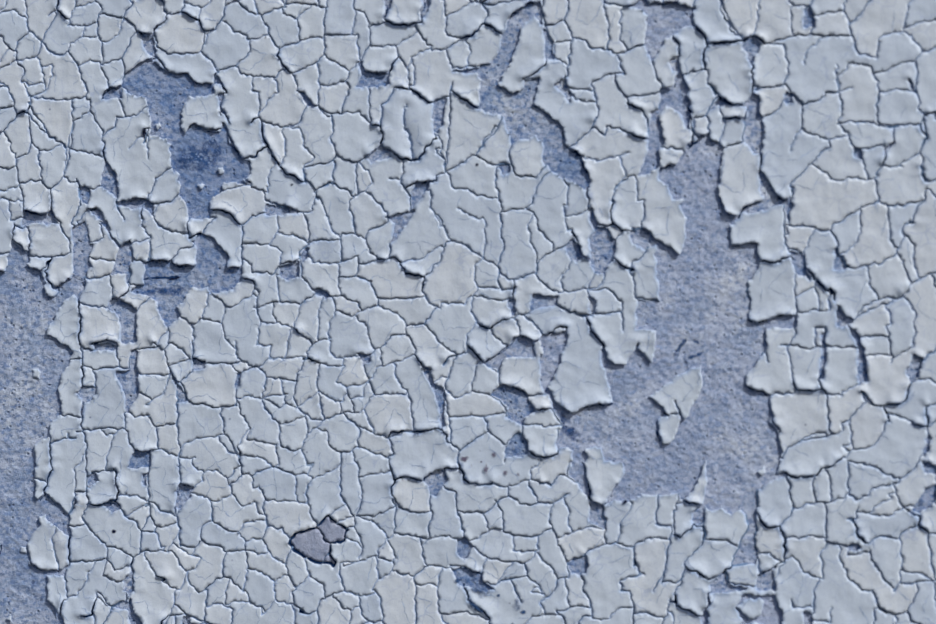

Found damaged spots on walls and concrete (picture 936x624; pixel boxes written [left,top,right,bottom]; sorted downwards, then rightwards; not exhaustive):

crack [687,82,746,150]
crack [22,223,71,289]
crack [59,310,132,390]
crack [110,267,178,309]
peeling [0,33,309,624]
crack [126,194,216,263]
crack [164,243,195,268]
peeling [383,0,851,624]
crack [762,256,790,264]
peeling [836,304,868,383]
crack [37,429,76,501]
crack [81,586,122,624]